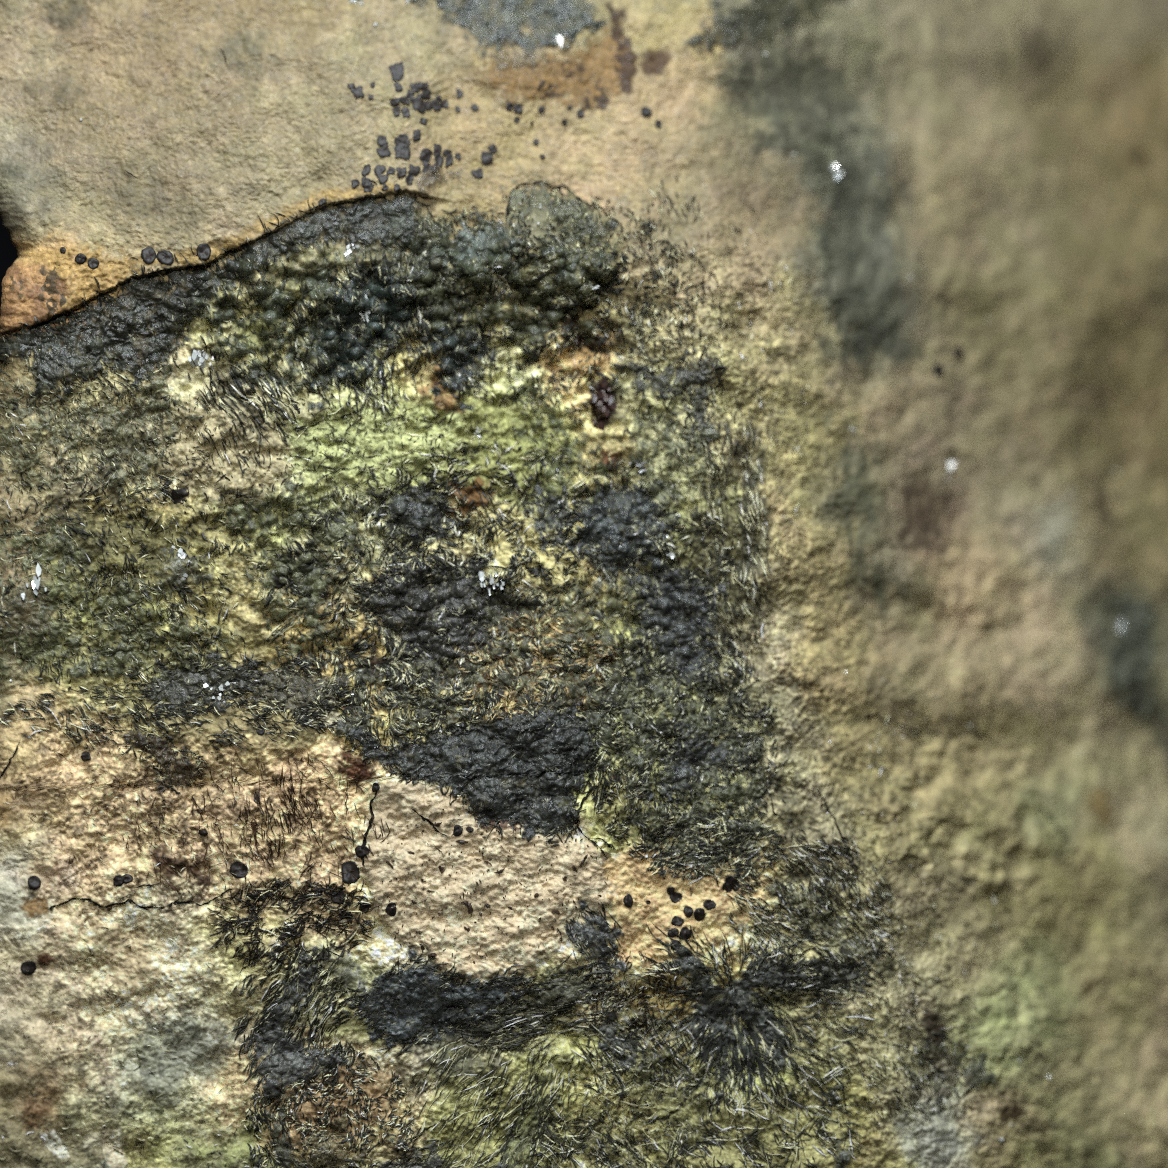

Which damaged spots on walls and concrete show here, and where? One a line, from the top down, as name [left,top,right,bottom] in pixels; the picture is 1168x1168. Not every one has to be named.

rust [477,2,671,110]
crack [129,225,281,276]
crack [857,713,998,747]
crack [43,883,235,913]